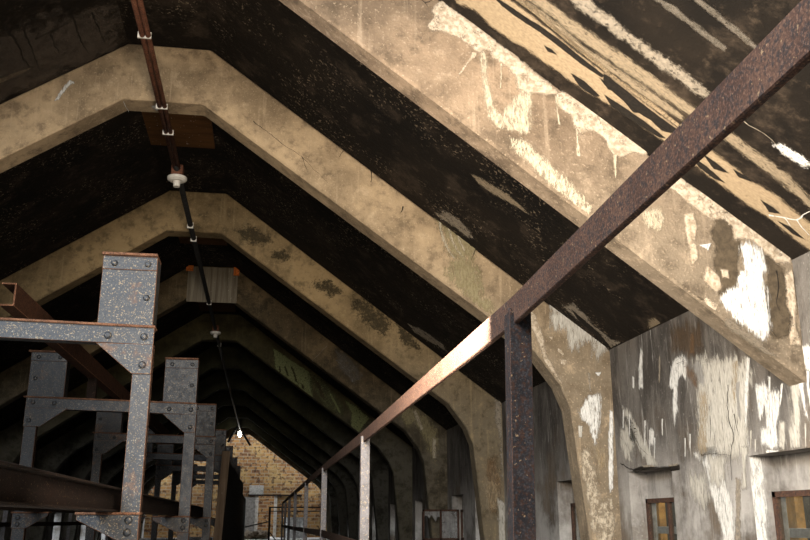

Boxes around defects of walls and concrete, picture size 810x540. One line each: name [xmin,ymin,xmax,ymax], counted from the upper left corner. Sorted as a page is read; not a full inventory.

damp [655,0,726,50]
damp [695,0,756,48]
damp [455,0,709,141]
damp [509,138,592,214]
damp [696,151,810,249]
damp [724,133,810,207]
crack [768,211,810,236]
damp [351,299,447,353]
peeling [549,305,607,365]
corrosion [669,318,704,360]
peeling [578,372,617,540]
crack [701,391,739,480]